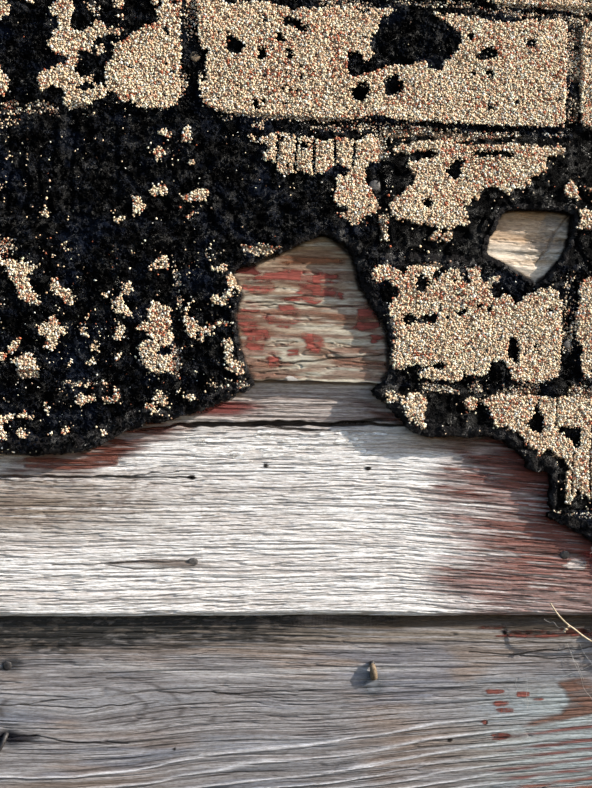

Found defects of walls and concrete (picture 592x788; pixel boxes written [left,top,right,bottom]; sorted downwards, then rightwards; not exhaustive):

peeling [0,0,592,455]
crack [165,418,404,431]
peeling [184,430,388,460]
peeling [560,510,592,538]
peeling [563,560,586,570]